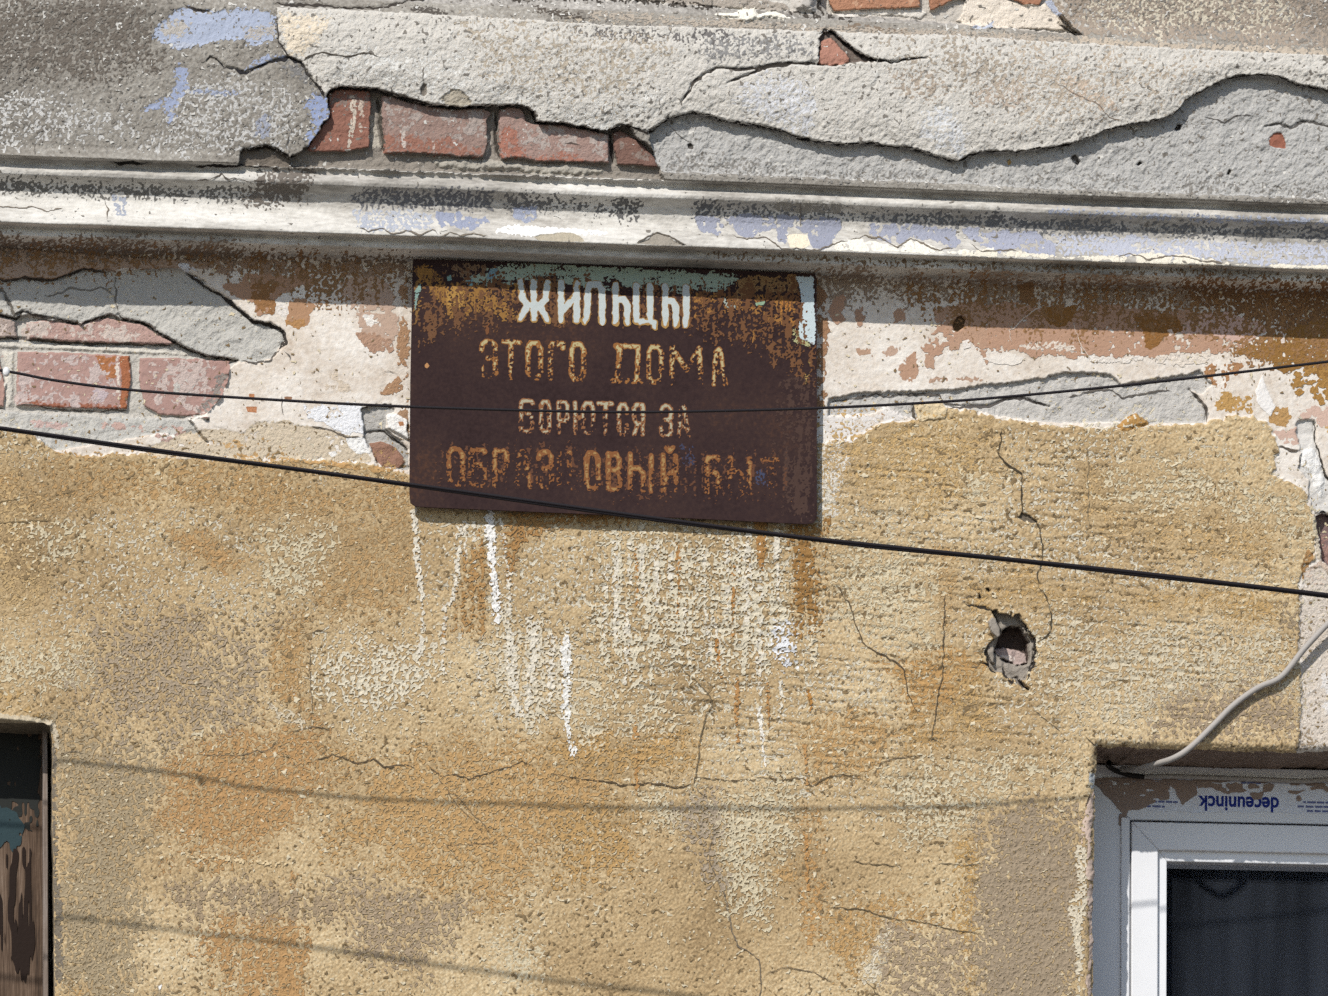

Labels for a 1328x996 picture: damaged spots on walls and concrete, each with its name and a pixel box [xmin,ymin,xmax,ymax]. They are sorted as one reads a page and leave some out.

crack [208,0,1328,163]
peeling [238,0,1328,200]
spalling [0,248,316,450]
spalling [328,406,409,470]
peeling [339,276,399,353]
peeling [828,294,866,328]
crack [1009,295,1041,339]
spalling [828,301,1285,424]
spalling [1255,375,1328,585]
damp [0,355,1328,996]
crack [203,322,1208,996]
spalling [984,610,1035,690]